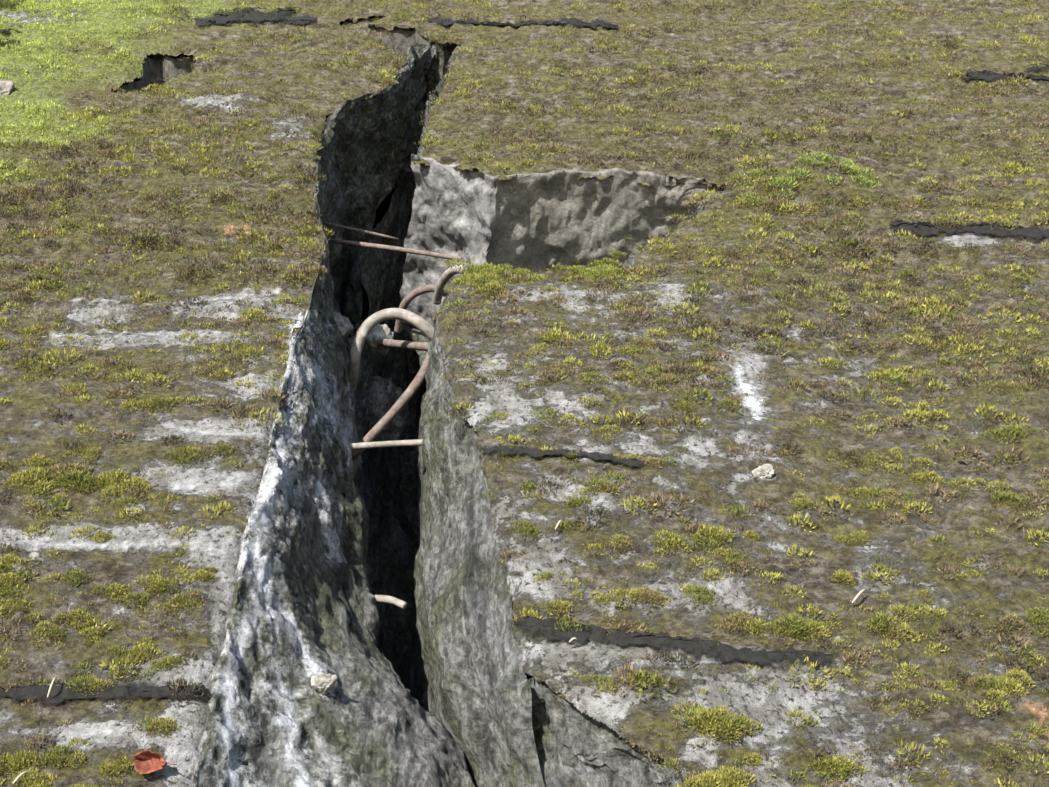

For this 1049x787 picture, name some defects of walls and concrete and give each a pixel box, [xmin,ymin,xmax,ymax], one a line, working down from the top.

crack [194,7,317,27]
spalling [110,55,196,93]
crack [961,63,1049,81]
spalling [179,94,248,116]
crack [890,220,1049,240]
spalling [399,154,726,367]
crack [0,17,834,787]